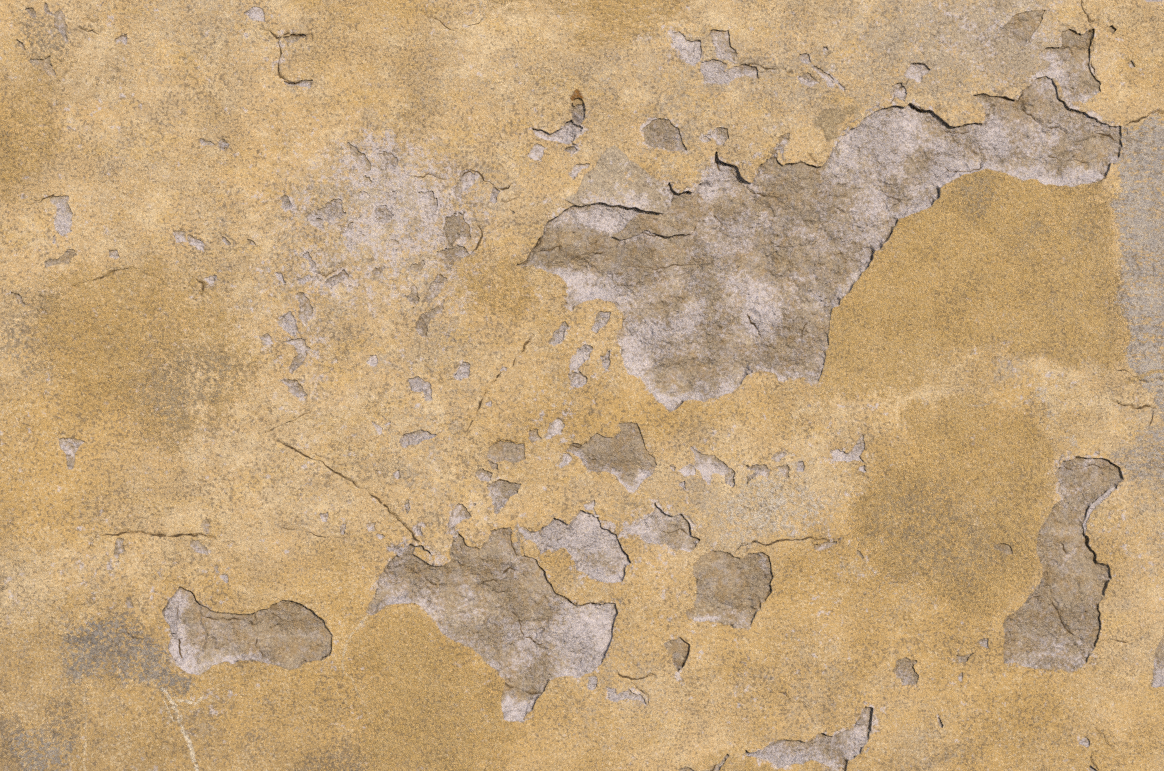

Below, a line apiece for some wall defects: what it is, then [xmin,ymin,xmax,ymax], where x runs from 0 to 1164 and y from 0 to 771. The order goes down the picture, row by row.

peeling [309,199,365,252]
peeling [347,142,518,345]
flaking render [516,0,1164,412]
peeling [259,252,349,397]
peeling [408,376,435,401]
crack [265,413,429,549]
flaking render [475,418,805,514]
flaking render [162,586,333,675]
flaking render [366,499,773,723]
flaking render [956,451,1129,682]
flaking render [1151,634,1164,688]
flaking render [745,706,873,771]